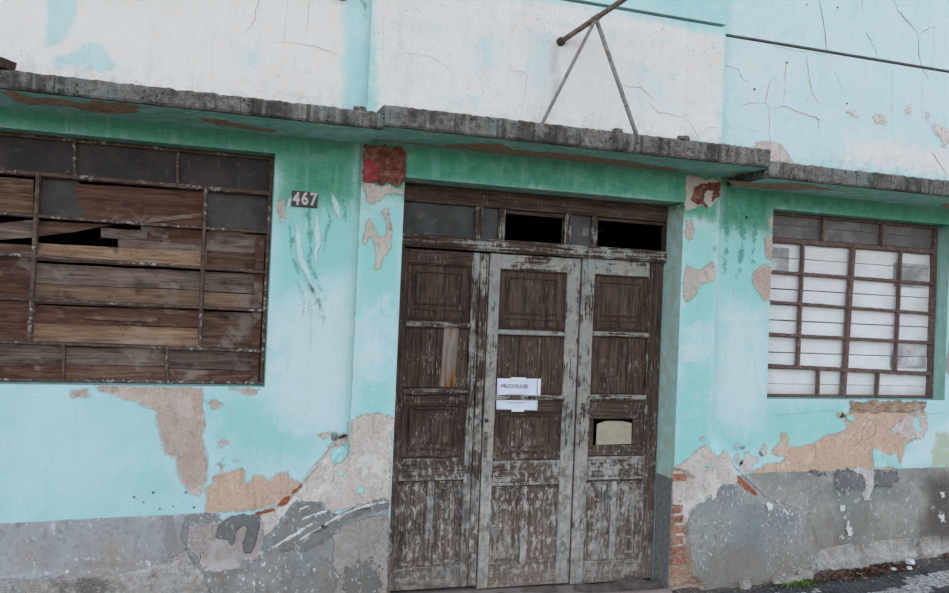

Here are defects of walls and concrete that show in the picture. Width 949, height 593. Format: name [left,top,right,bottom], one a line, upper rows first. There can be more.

rust [2,90,143,114]
rust [197,117,277,133]
rust [362,140,681,187]
crack [741,1,841,139]
leakage [286,195,346,318]
peeling [362,182,405,270]
peeling [683,246,717,302]
peeling [684,174,720,240]
peeling [751,217,773,301]
flaking render [68,385,394,593]
peeling [669,400,929,590]